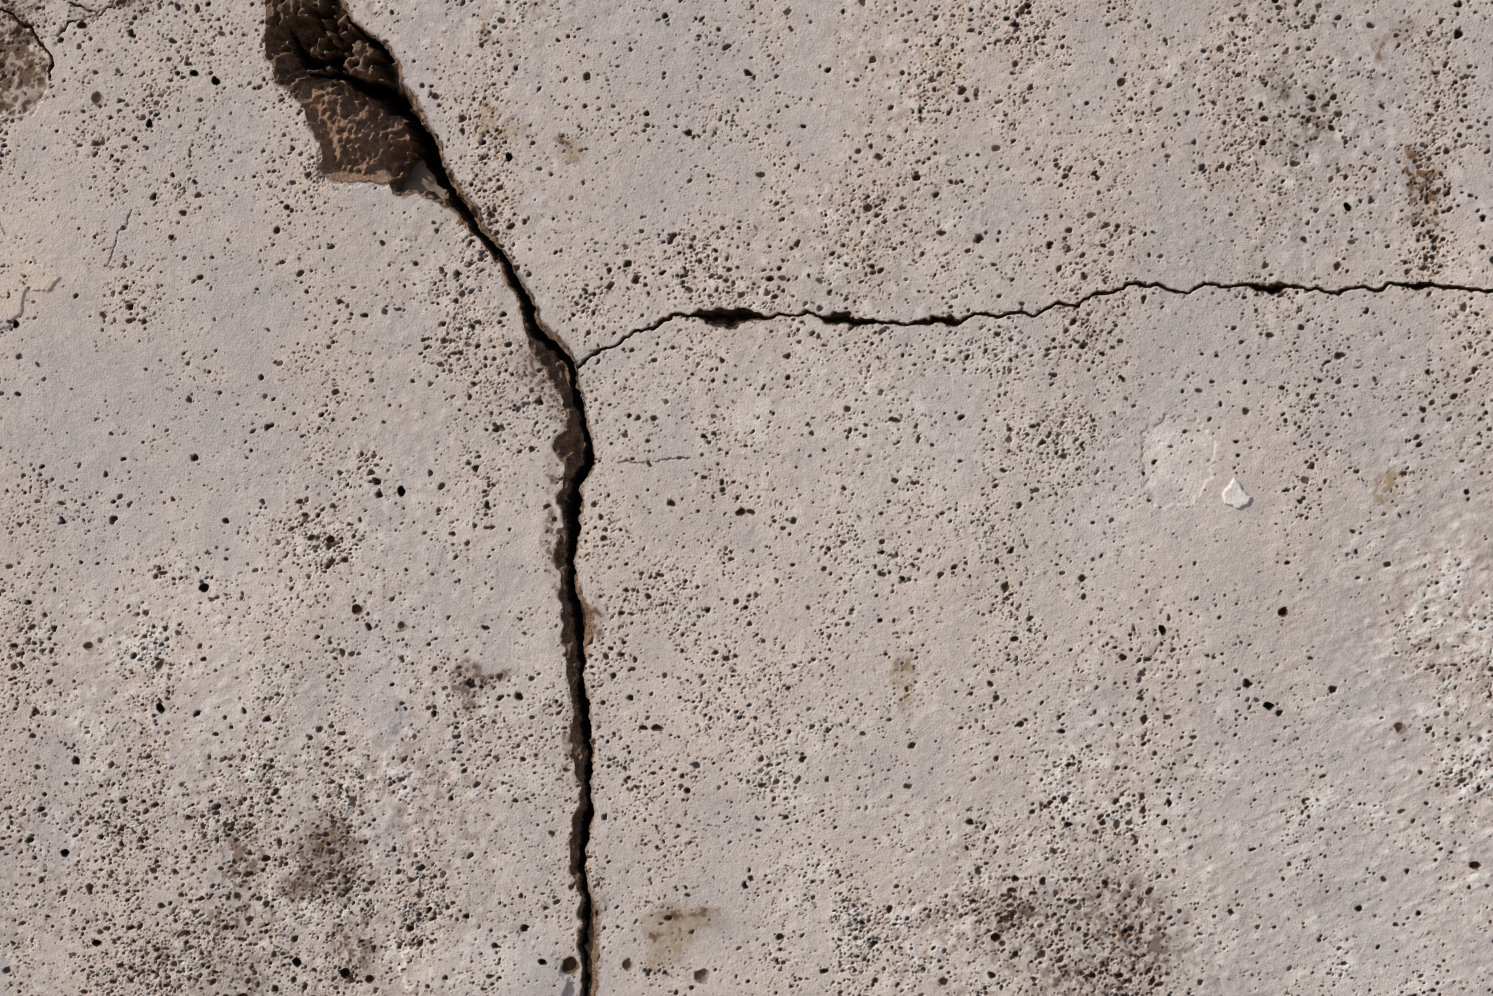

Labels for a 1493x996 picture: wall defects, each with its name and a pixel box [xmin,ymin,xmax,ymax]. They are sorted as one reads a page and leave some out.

crack [58,2,114,37]
crack [577,281,1493,368]
crack [263,0,600,996]
crack [618,456,690,465]